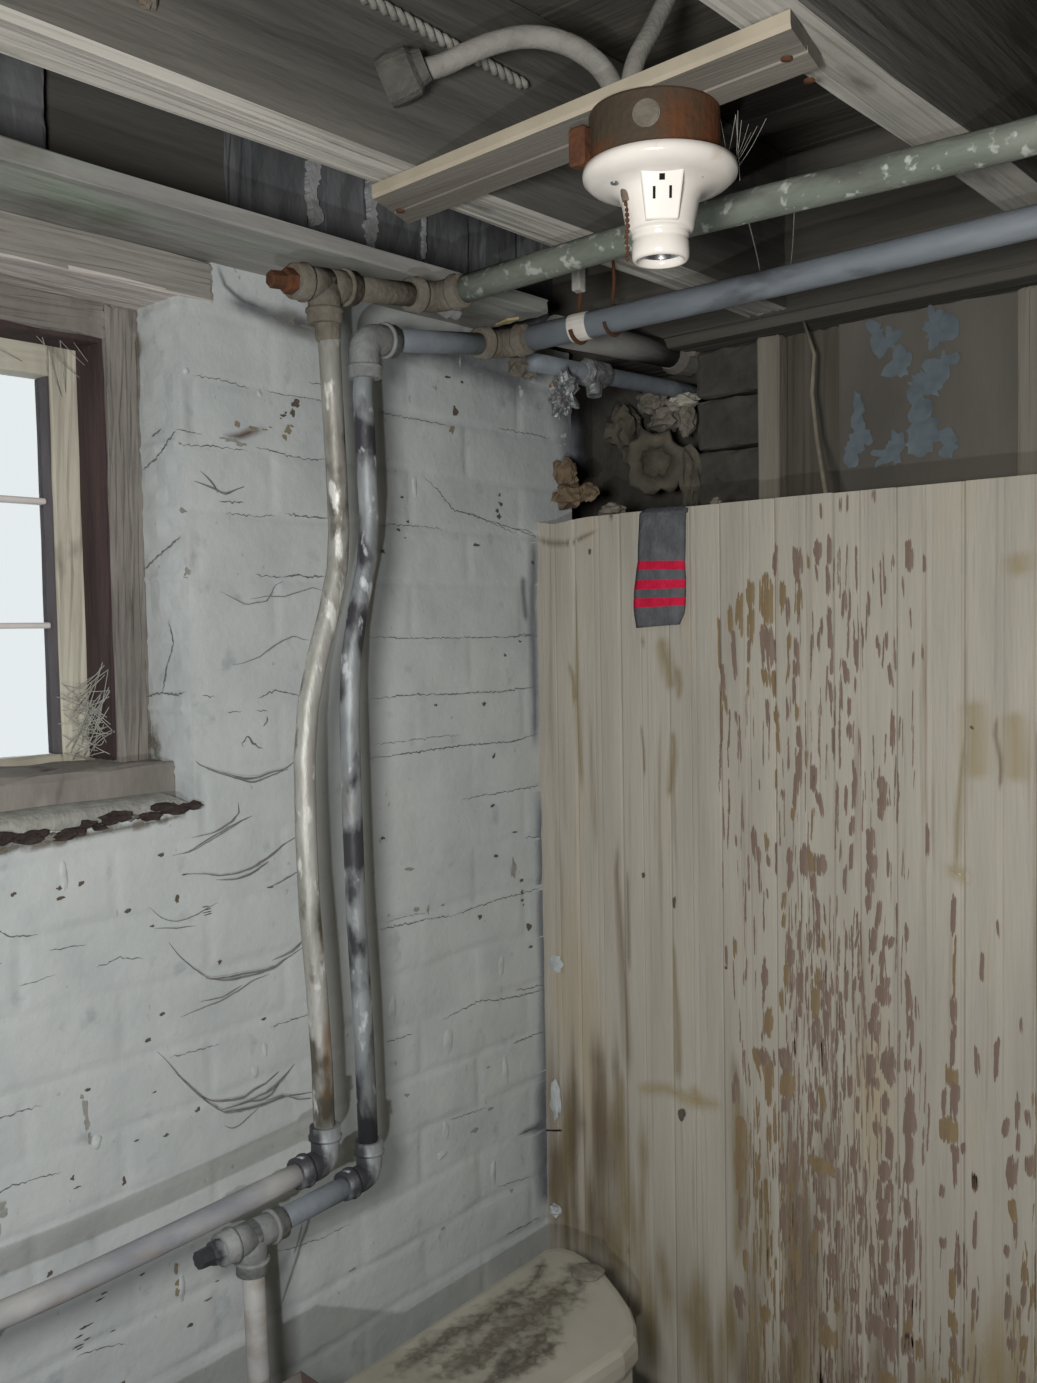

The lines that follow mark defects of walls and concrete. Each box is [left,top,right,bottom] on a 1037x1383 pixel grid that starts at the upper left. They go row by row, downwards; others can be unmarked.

peeling [843,305,960,468]
spalling [0,800,204,846]
peeling [717,504,1000,1383]
peeling [1001,1092,1037,1383]